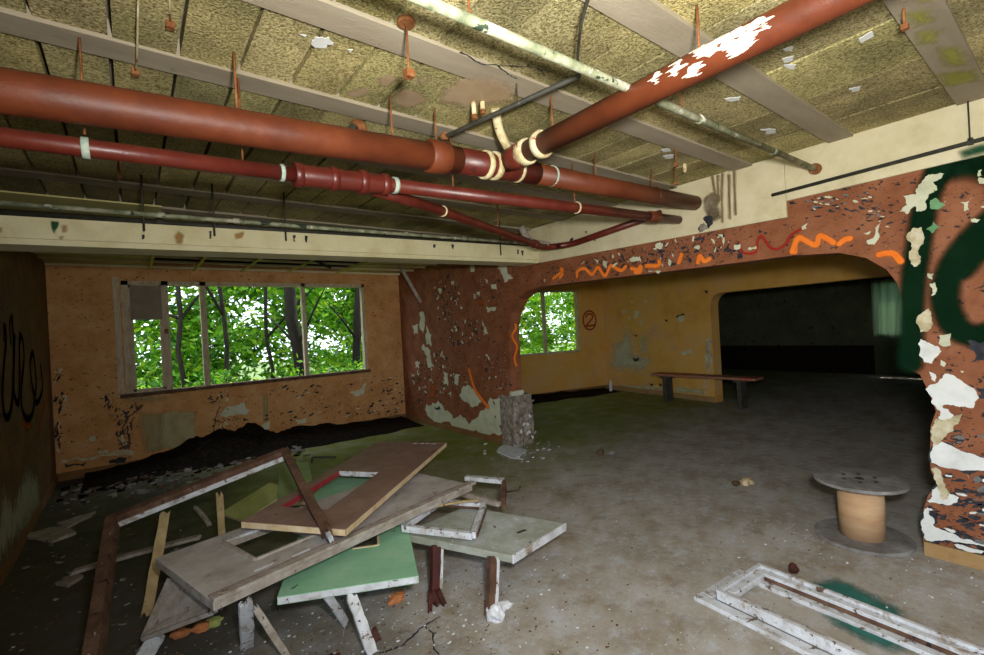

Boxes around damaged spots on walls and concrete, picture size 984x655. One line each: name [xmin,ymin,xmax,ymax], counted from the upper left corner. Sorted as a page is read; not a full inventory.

peeling [647,16,774,85]
peeling [782,46,796,70]
peeling [578,215,757,274]
peeling [805,192,893,245]
peeling [900,173,945,214]
spalling [906,221,939,267]
spalling [262,265,565,462]
crack [379,616,440,655]